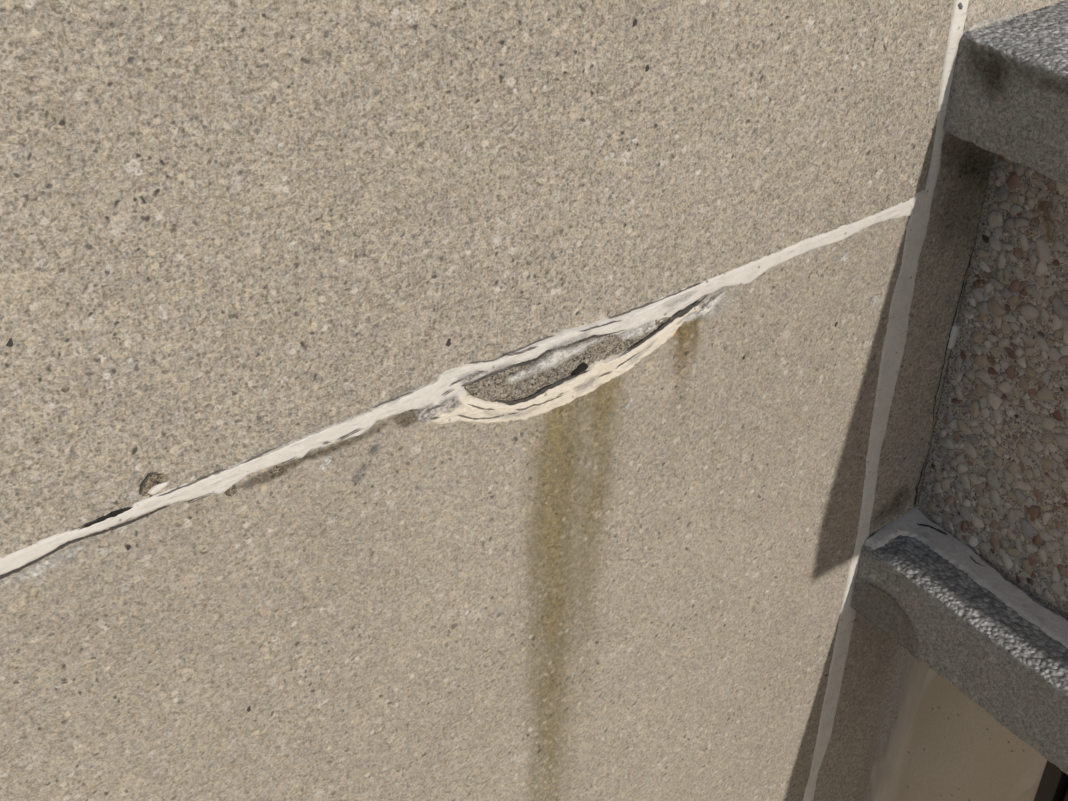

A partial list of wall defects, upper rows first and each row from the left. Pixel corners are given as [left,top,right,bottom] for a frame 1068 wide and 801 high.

crack [469,335,555,364]
crack [609,282,703,319]
crack [0,392,412,579]
leakage [592,379,616,509]
leakage [540,406,572,761]